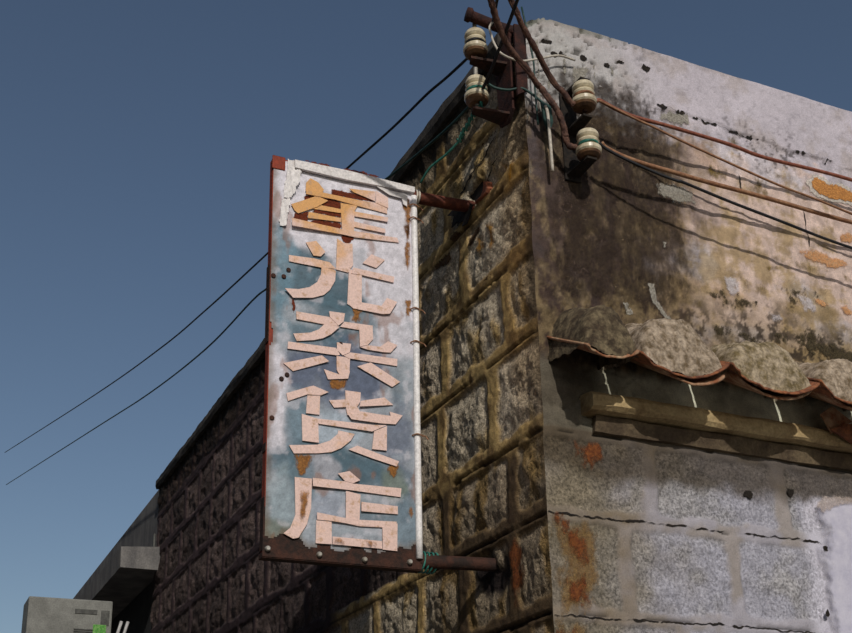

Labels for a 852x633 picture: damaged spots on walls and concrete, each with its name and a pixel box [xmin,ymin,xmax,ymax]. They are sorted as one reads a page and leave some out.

crack [460,137,497,194]
damp [553,65,684,319]
peeling [806,175,852,206]
corrosion [509,540,524,591]
corrosion [555,512,597,609]
crack [548,510,723,532]
crack [745,533,821,544]
crack [554,614,815,633]